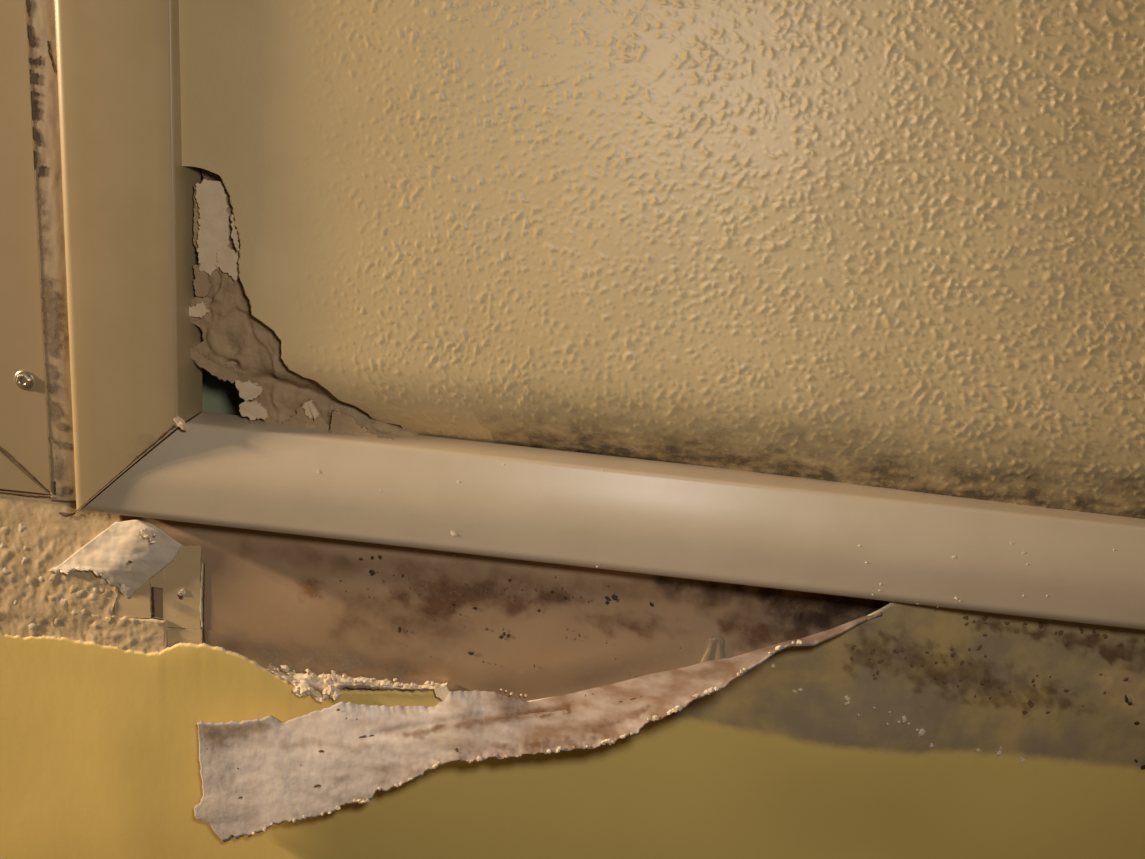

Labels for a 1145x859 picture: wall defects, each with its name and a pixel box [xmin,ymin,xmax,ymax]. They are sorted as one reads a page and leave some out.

spalling [189,168,418,439]
peeling [48,520,202,647]
leakage [359,555,620,628]
leakage [658,577,883,641]
leakage [869,616,1131,688]
peeling [194,612,883,842]